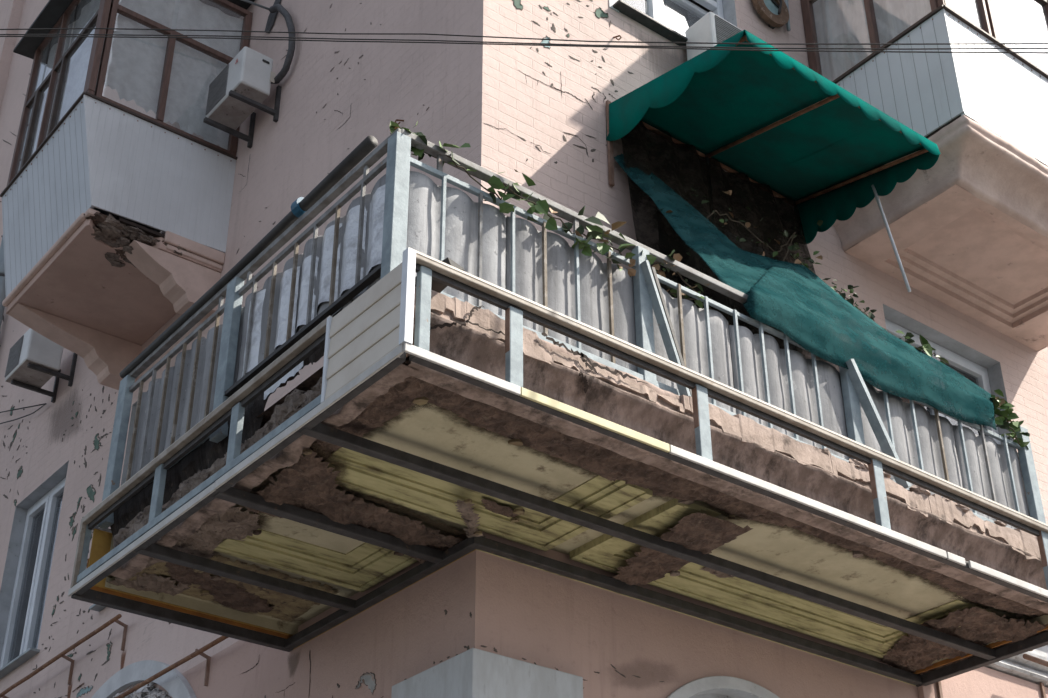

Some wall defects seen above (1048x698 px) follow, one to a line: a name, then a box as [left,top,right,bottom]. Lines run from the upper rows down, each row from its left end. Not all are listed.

peeling [530,5,570,87]
peeling [567,0,612,27]
spalling [84,212,191,268]
spalling [431,290,505,343]
spalling [523,327,693,415]
peeling [0,386,30,506]
peeling [62,386,116,540]
spalling [240,377,322,454]
spalling [106,439,525,622]
spalling [335,360,1048,675]
peeling [42,575,93,652]
peeling [54,628,113,698]